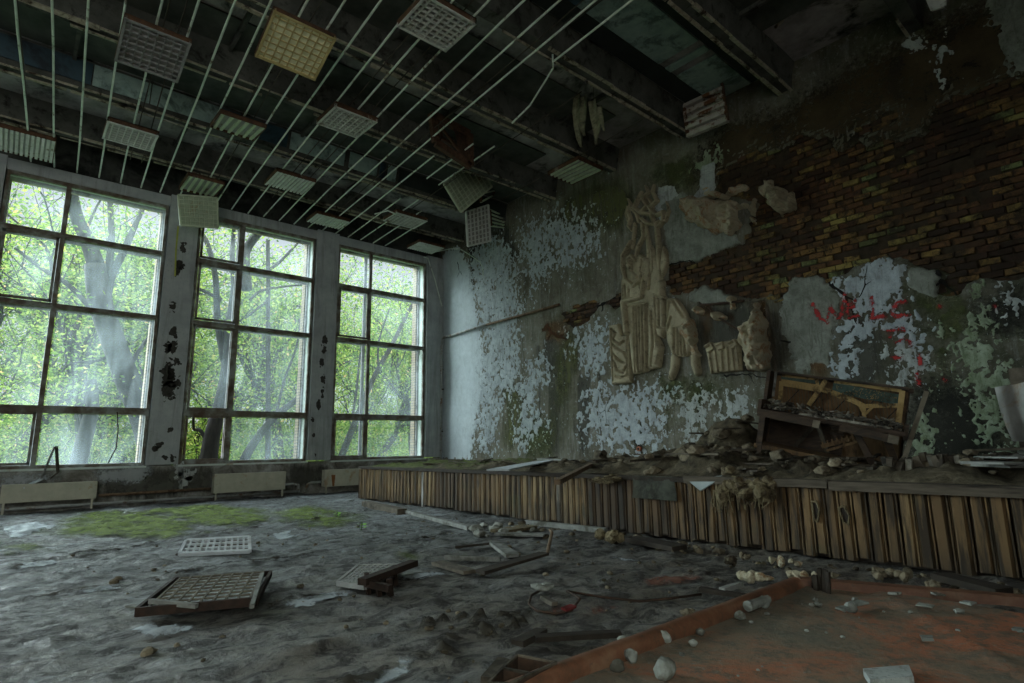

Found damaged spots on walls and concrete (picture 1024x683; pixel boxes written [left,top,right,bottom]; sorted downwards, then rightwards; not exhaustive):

peeling [175,242,187,277]
flaking render [655,0,1024,457]
peeling [159,326,182,402]
peeling [311,335,328,437]
damp [538,340,601,454]
peeling [442,191,756,460]
damp [977,288,1024,337]
peeling [152,426,197,489]